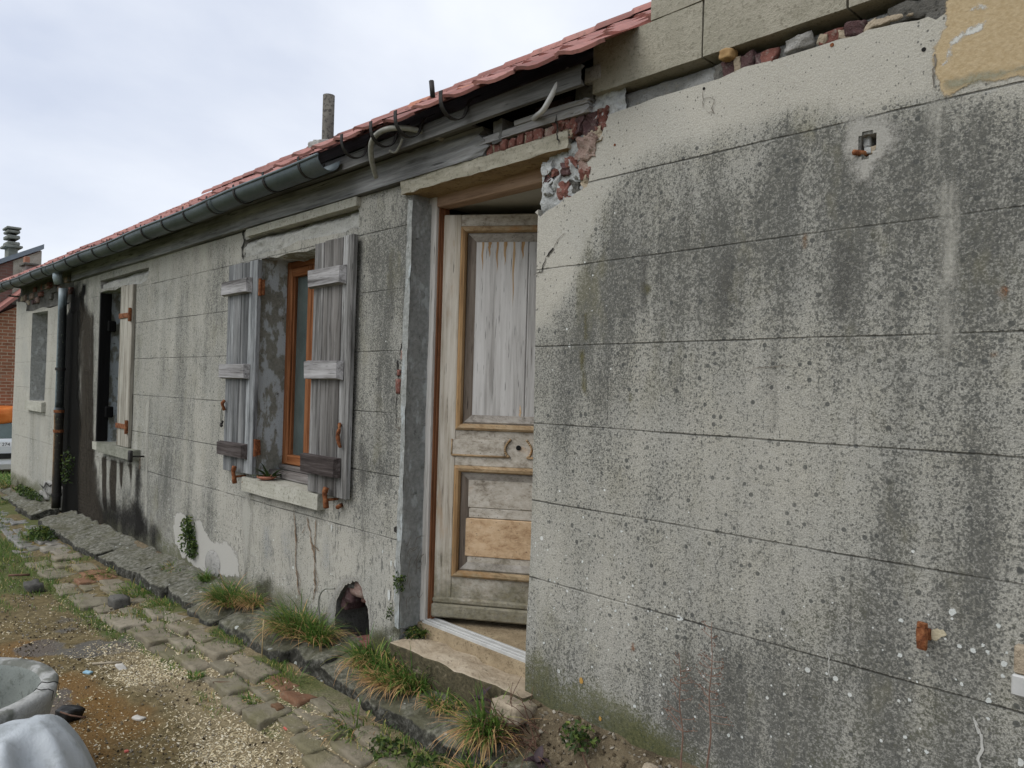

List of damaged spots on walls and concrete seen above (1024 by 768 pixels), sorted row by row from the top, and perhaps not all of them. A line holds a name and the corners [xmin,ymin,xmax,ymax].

peeling [476,0,1024,214]
damp [941,186,956,282]
damp [61,281,158,544]
peeling [173,498,252,579]
spalling [318,577,373,650]